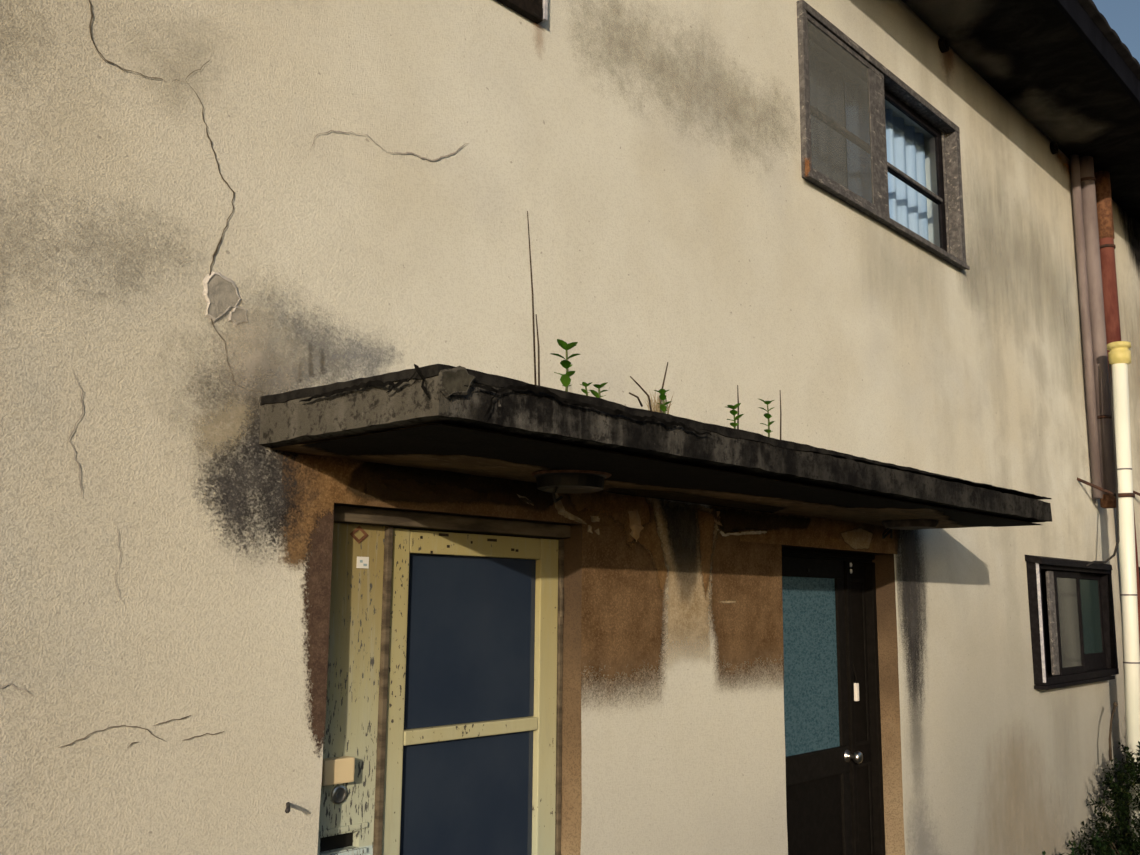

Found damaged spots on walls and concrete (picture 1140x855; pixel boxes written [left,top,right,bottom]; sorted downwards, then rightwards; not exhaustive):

crack [89,0,235,276]
crack [310,130,469,161]
damp [1118,205,1140,273]
spalling [202,272,248,326]
crack [211,318,271,394]
peeling [347,462,600,535]
damp [198,313,1041,757]
peeling [609,488,810,542]
crack [58,715,224,748]